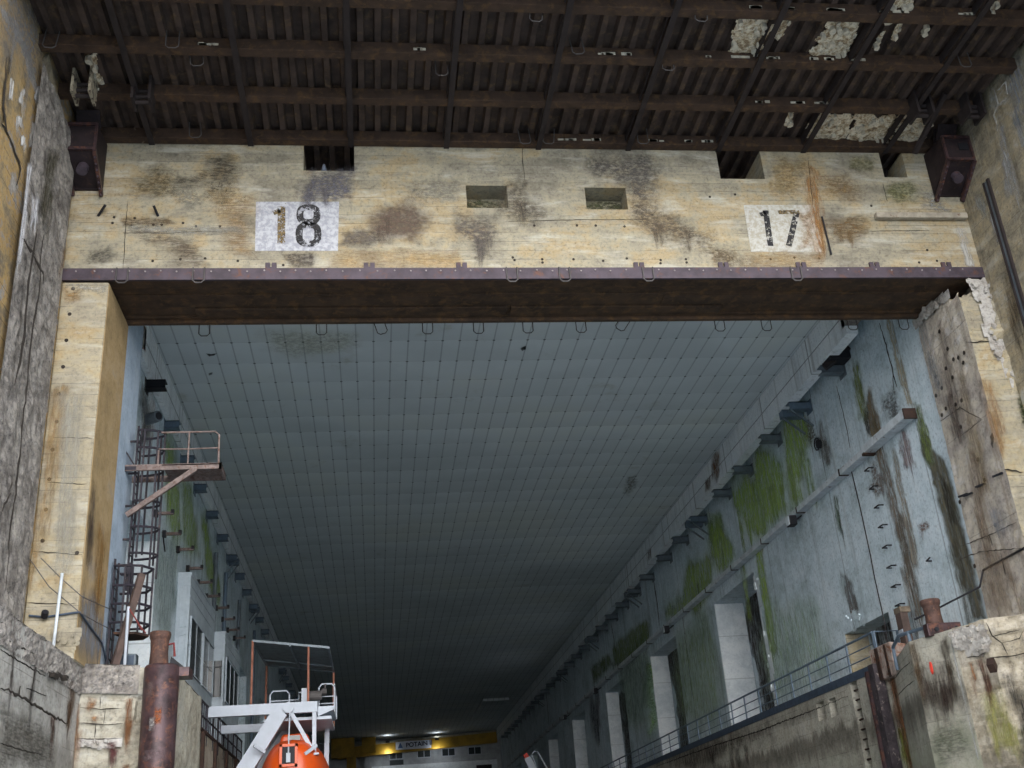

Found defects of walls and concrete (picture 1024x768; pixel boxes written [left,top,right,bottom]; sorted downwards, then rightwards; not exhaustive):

peeling [728,19,791,57]
peeling [809,22,860,59]
crack [2,58,21,184]
peeling [784,113,934,143]
water stain [588,155,705,245]
corrosion [776,159,863,251]
spalling [966,277,1014,388]
water stain [859,385,881,437]
water stain [876,446,966,716]
water stain [920,421,985,625]
crack [959,522,1021,572]
crack [0,622,123,740]